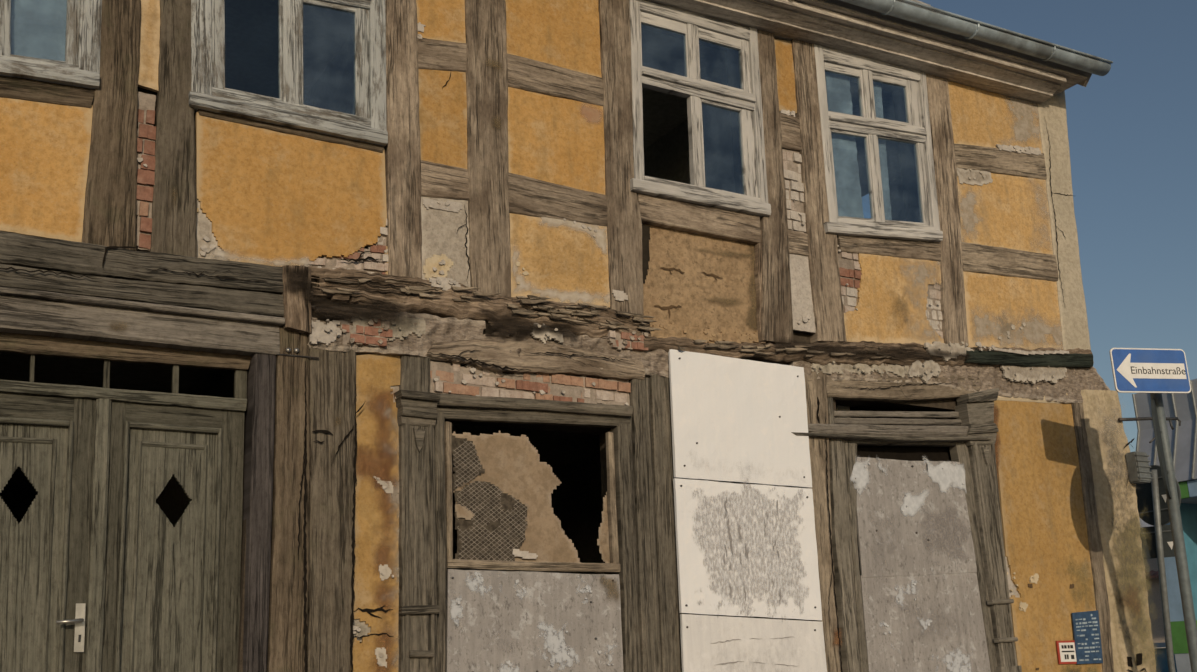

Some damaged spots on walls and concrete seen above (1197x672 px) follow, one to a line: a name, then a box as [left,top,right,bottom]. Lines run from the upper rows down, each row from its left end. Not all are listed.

flaking render [136,92,156,252]
flaking render [196,200,236,261]
flaking render [782,149,806,233]
crack [1046,124,1073,304]
flaking render [273,219,426,347]
flaking render [837,245,862,313]
spalling [811,284,1069,384]
flaking render [430,361,631,406]
crack [354,605,393,639]